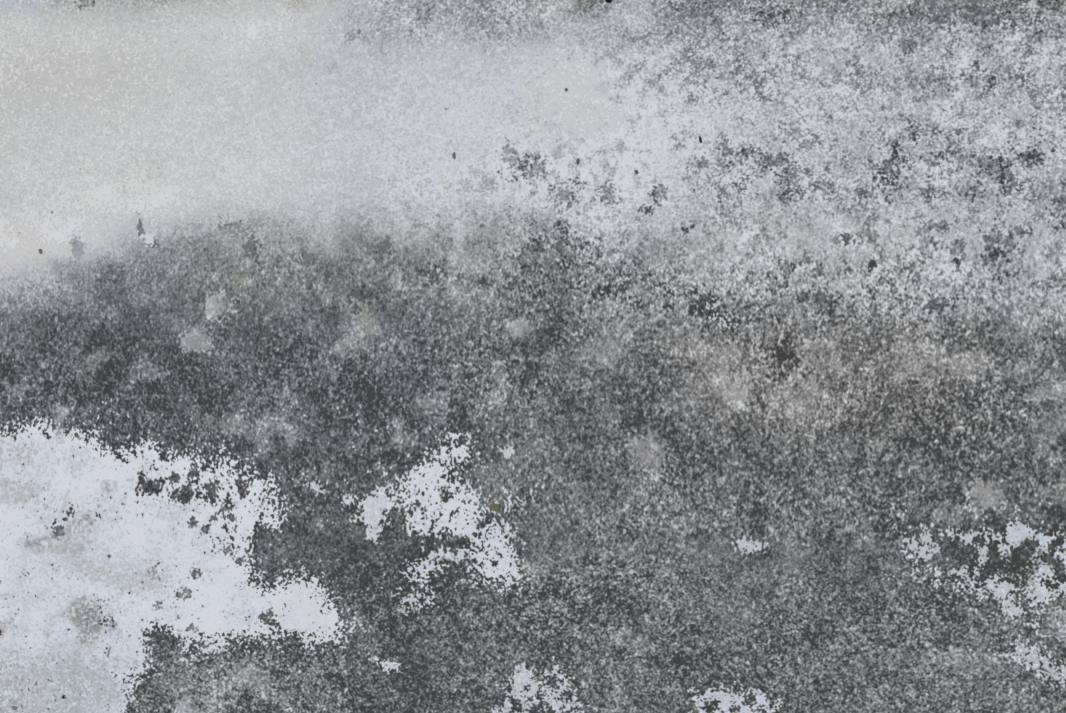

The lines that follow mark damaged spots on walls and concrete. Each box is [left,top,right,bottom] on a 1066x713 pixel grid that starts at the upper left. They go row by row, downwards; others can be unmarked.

damp [25,512,172,600]
mould [1002,553,1037,589]
damp [0,596,138,713]